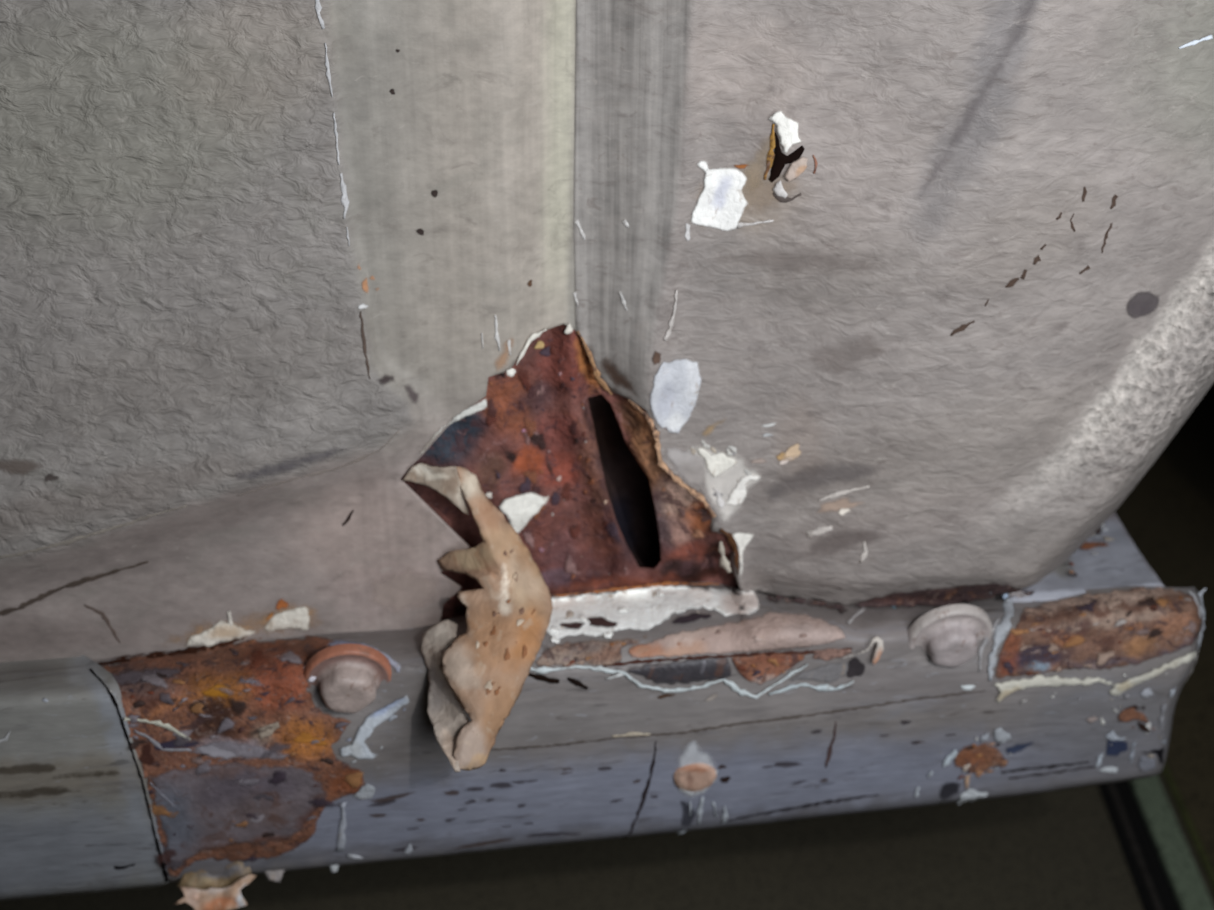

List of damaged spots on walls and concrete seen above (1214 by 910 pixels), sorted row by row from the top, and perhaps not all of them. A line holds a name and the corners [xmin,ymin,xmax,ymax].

crack [315,0,350,246]
peeling [685,161,774,241]
damp [1127,292,1159,318]
rust [627,399,716,518]
crack [0,561,148,644]
peeling [187,599,313,646]
peeling [403,400,884,772]
rust [768,583,1206,773]
rust [89,636,409,882]
crack [623,741,657,838]
rust [915,728,1032,805]
peeling [173,861,285,910]